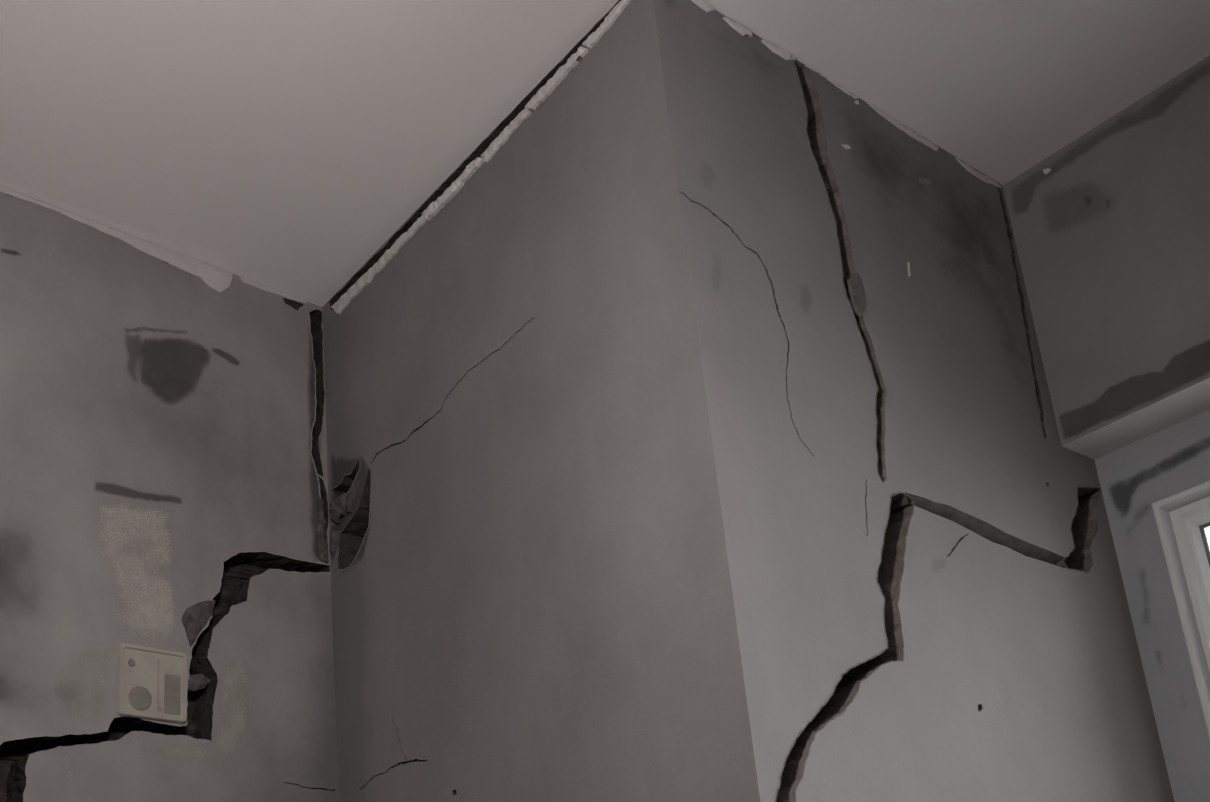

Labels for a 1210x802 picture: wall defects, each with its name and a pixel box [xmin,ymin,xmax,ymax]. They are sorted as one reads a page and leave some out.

leakage [143,340,207,400]
crack [0,0,631,802]
crack [679,0,1101,802]